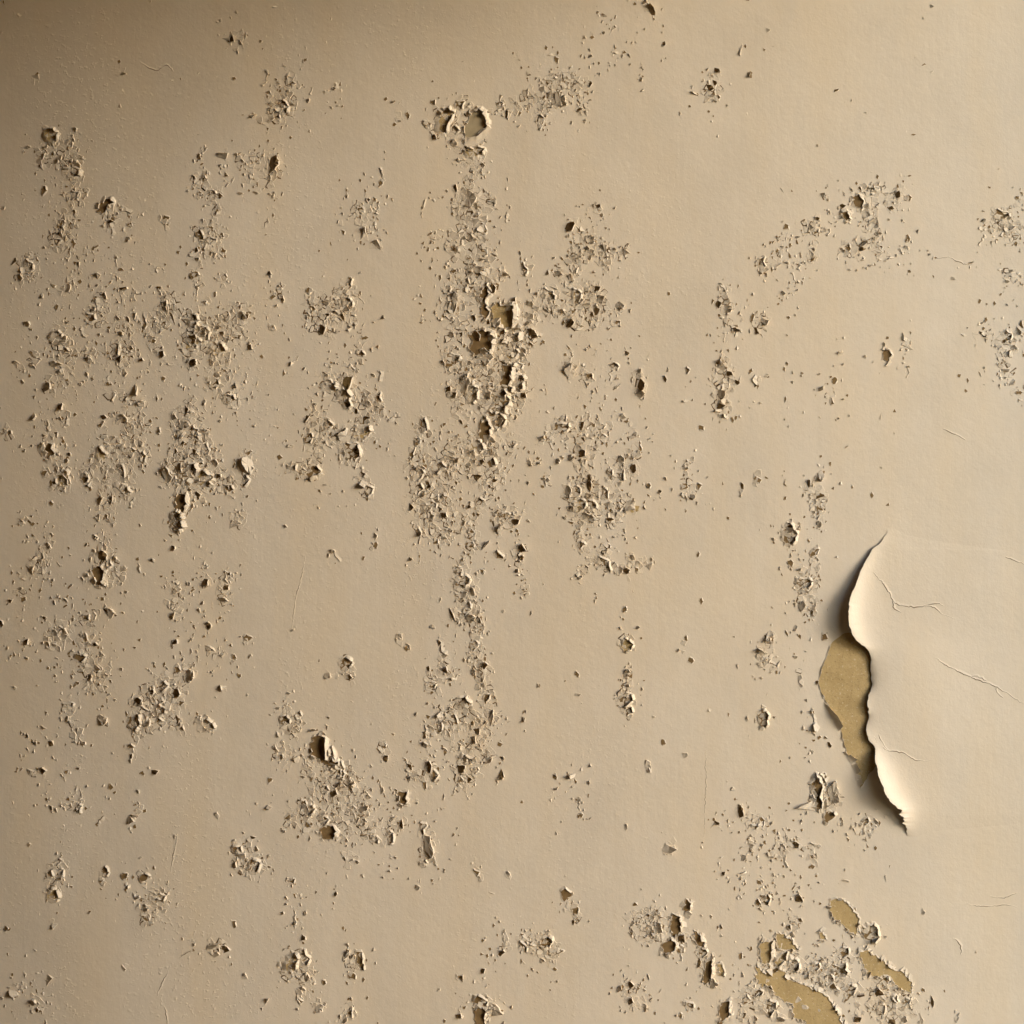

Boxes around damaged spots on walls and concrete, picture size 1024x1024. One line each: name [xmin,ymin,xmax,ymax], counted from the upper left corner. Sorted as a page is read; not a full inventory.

peeling [0,54,347,833]
peeling [228,0,714,916]
peeling [664,172,937,432]
peeling [609,455,1024,1024]
peeling [951,186,1024,406]